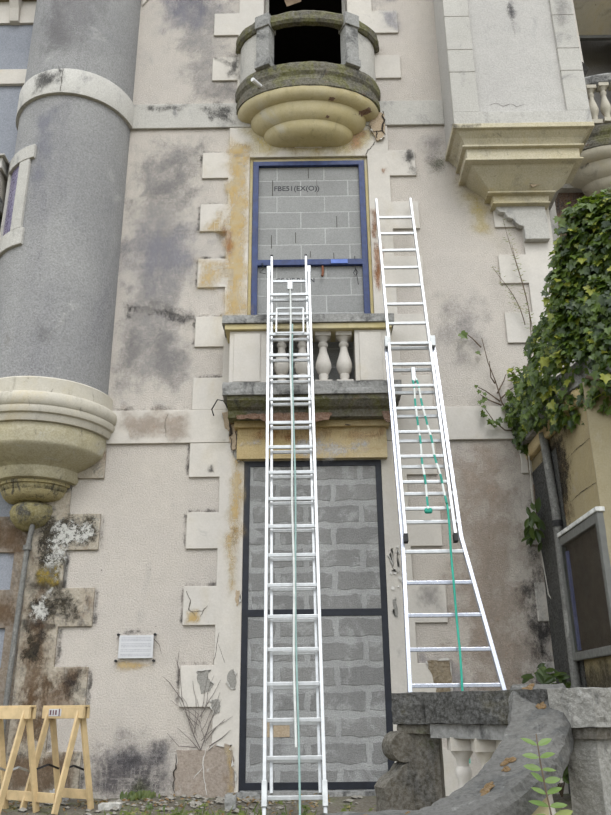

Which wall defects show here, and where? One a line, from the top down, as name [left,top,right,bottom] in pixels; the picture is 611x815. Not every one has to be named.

crack [366,111,386,154]
water stain [15,571,78,743]
water stain [10,755,70,792]